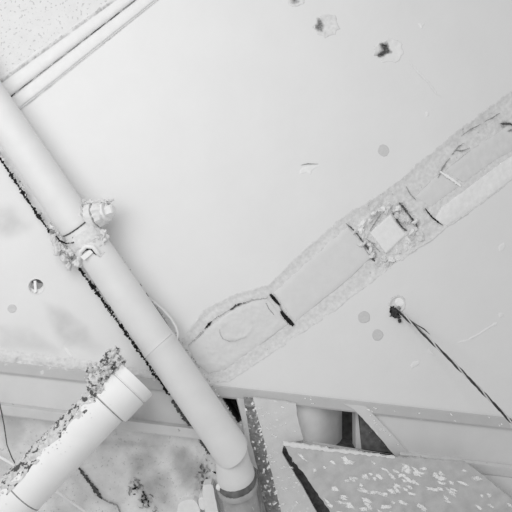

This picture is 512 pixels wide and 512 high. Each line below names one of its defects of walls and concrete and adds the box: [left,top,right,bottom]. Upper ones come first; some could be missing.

spalling [315,14,340,38]
spalling [373,38,403,63]
crack [438,113,512,177]
crack [0,152,52,235]
spalling [179,91,512,385]
crack [348,187,418,262]
spalling [0,349,101,371]
crack [71,258,191,426]
crack [188,294,295,345]